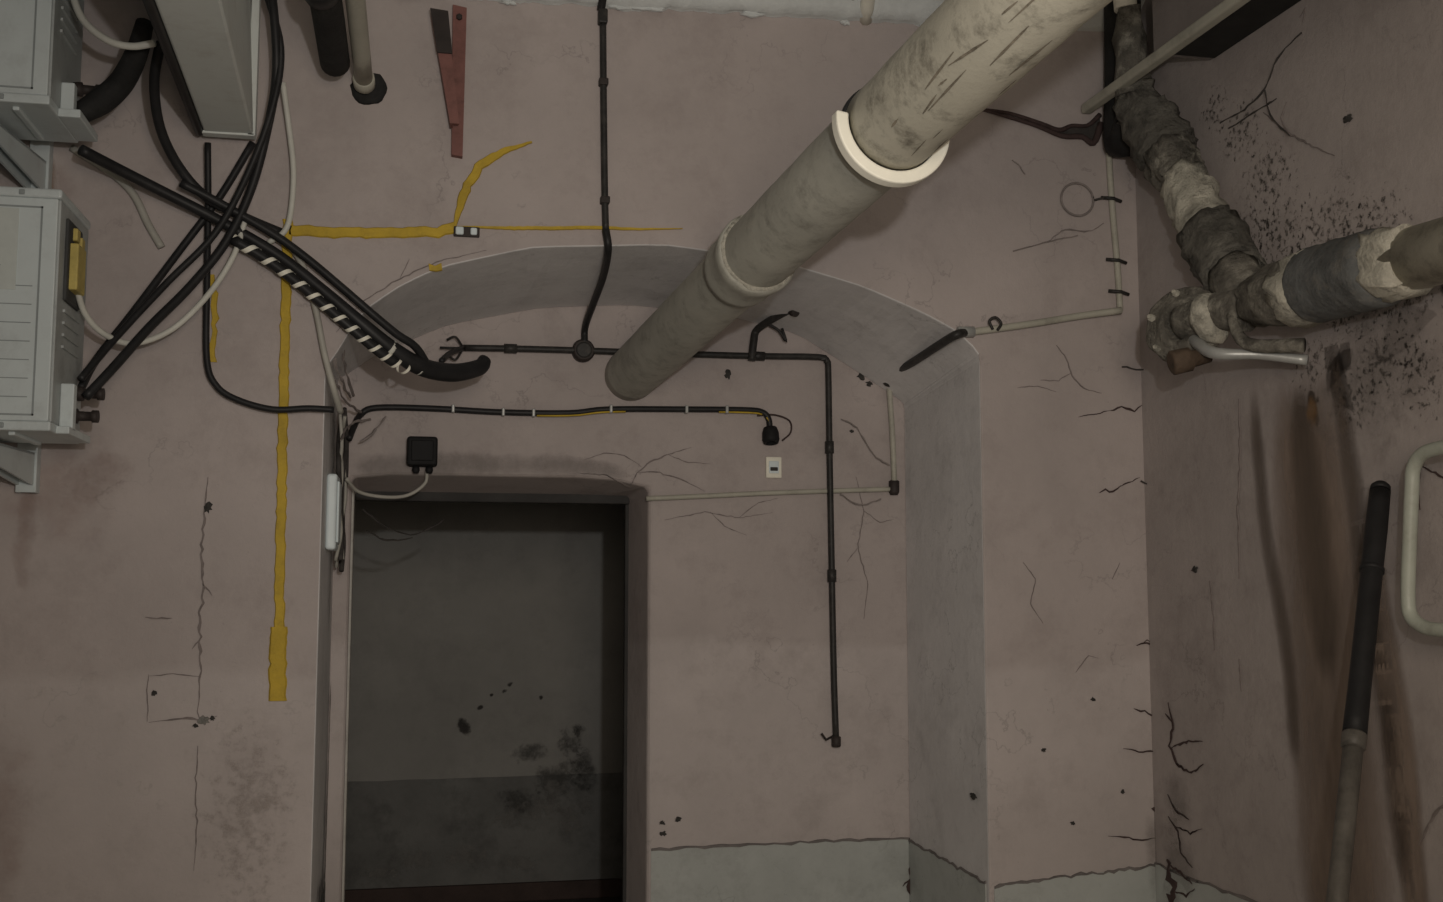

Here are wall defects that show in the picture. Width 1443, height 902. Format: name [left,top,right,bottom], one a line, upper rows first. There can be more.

crack [1263,102,1335,156]
damp [1201,95,1412,263]
crack [1018,345,1142,417]
crack [1099,477,1140,493]
crack [1023,562,1043,623]
crack [145,479,217,864]
crack [1111,702,1204,902]